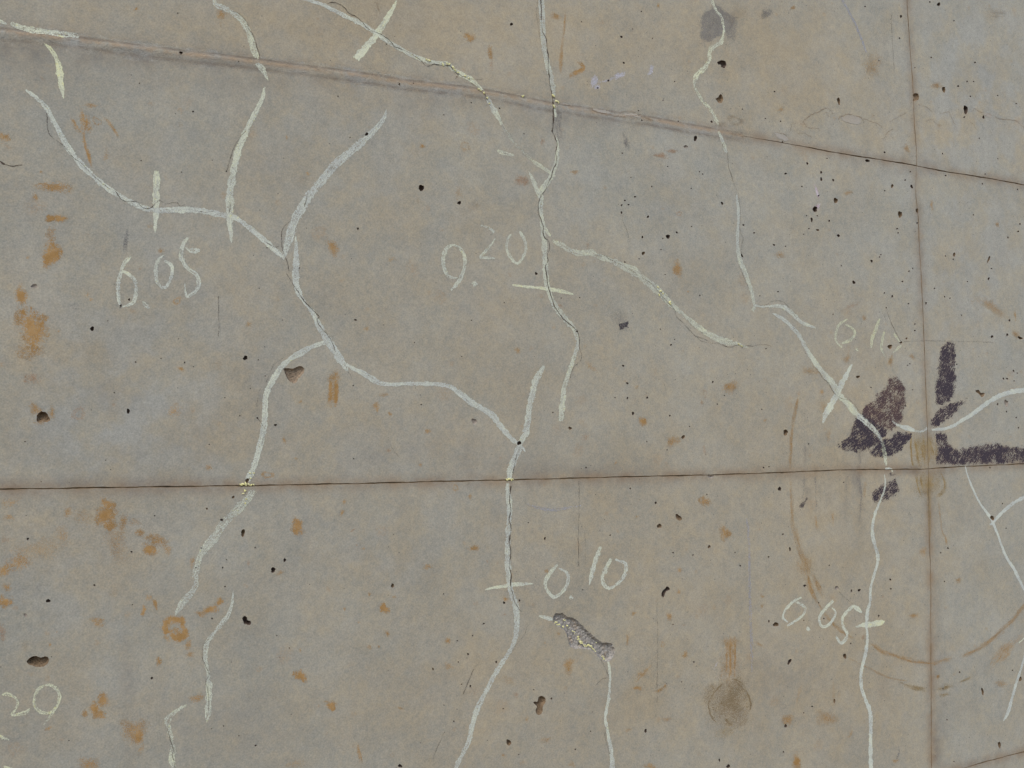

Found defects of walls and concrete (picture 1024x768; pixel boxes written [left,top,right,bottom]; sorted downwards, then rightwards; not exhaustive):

crack [536,0,582,378]
corrosion [14,284,59,361]
corrosion [0,497,174,641]
corrosion [140,595,223,657]